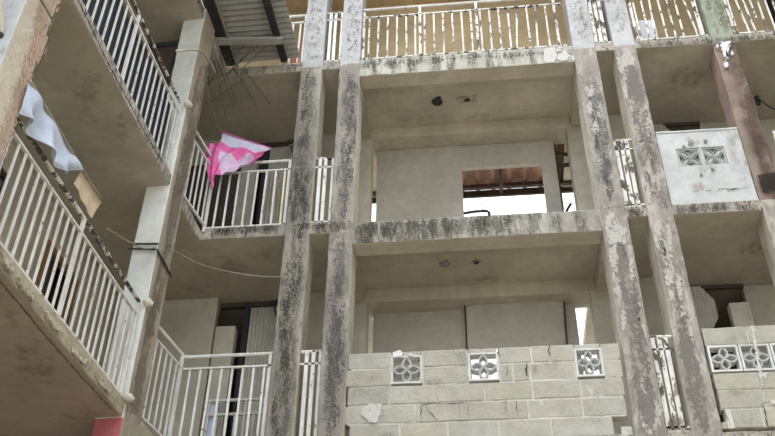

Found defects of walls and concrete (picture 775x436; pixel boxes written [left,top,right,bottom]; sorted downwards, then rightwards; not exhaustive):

water stain [361,48,544,75]
water stain [214,225,278,234]
water stain [271,137,539,436]
peeling [603,212,647,352]
peeling [653,219,686,328]
crack [421,402,470,422]
peeling [640,391,663,435]